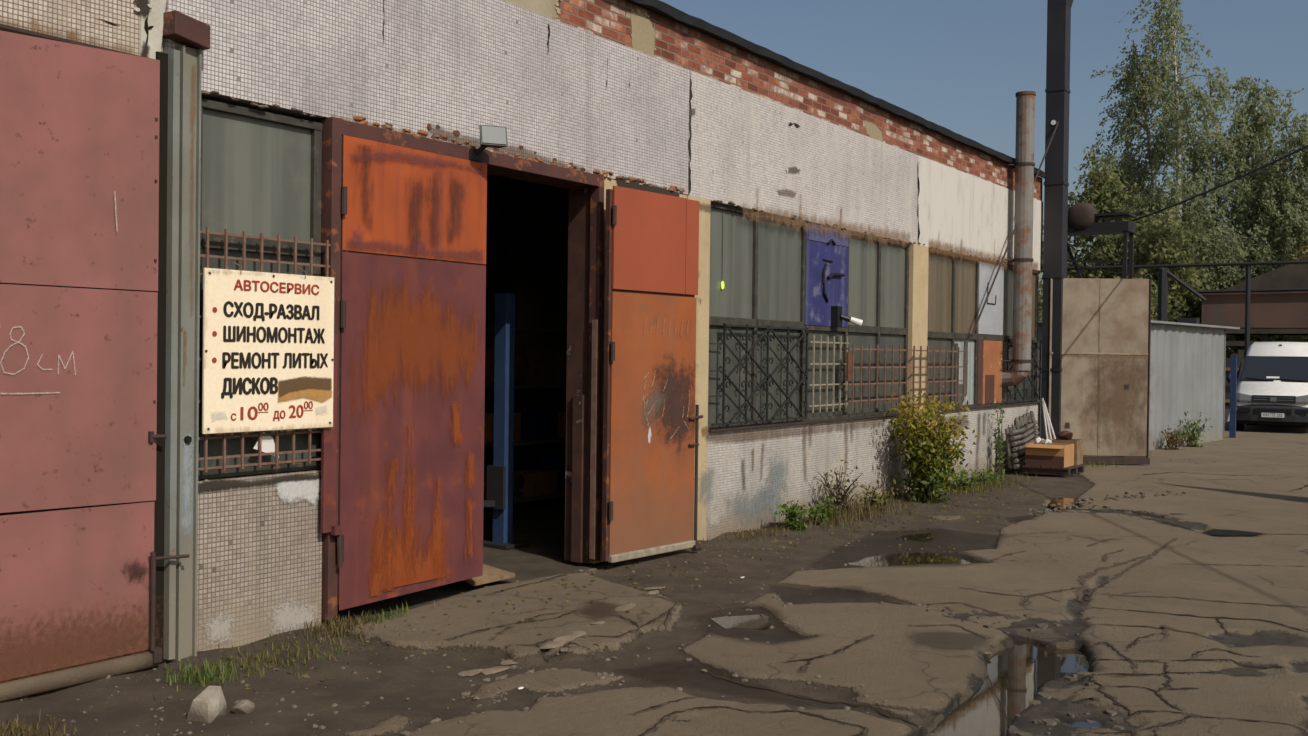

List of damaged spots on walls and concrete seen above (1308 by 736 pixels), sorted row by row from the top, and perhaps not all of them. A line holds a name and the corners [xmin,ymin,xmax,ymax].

crack [101,12,154,44]
crack [687,72,695,194]
rust [370,460,448,597]
rust [452,402,474,556]
crack [896,509,1308,617]
crack [1066,618,1306,736]